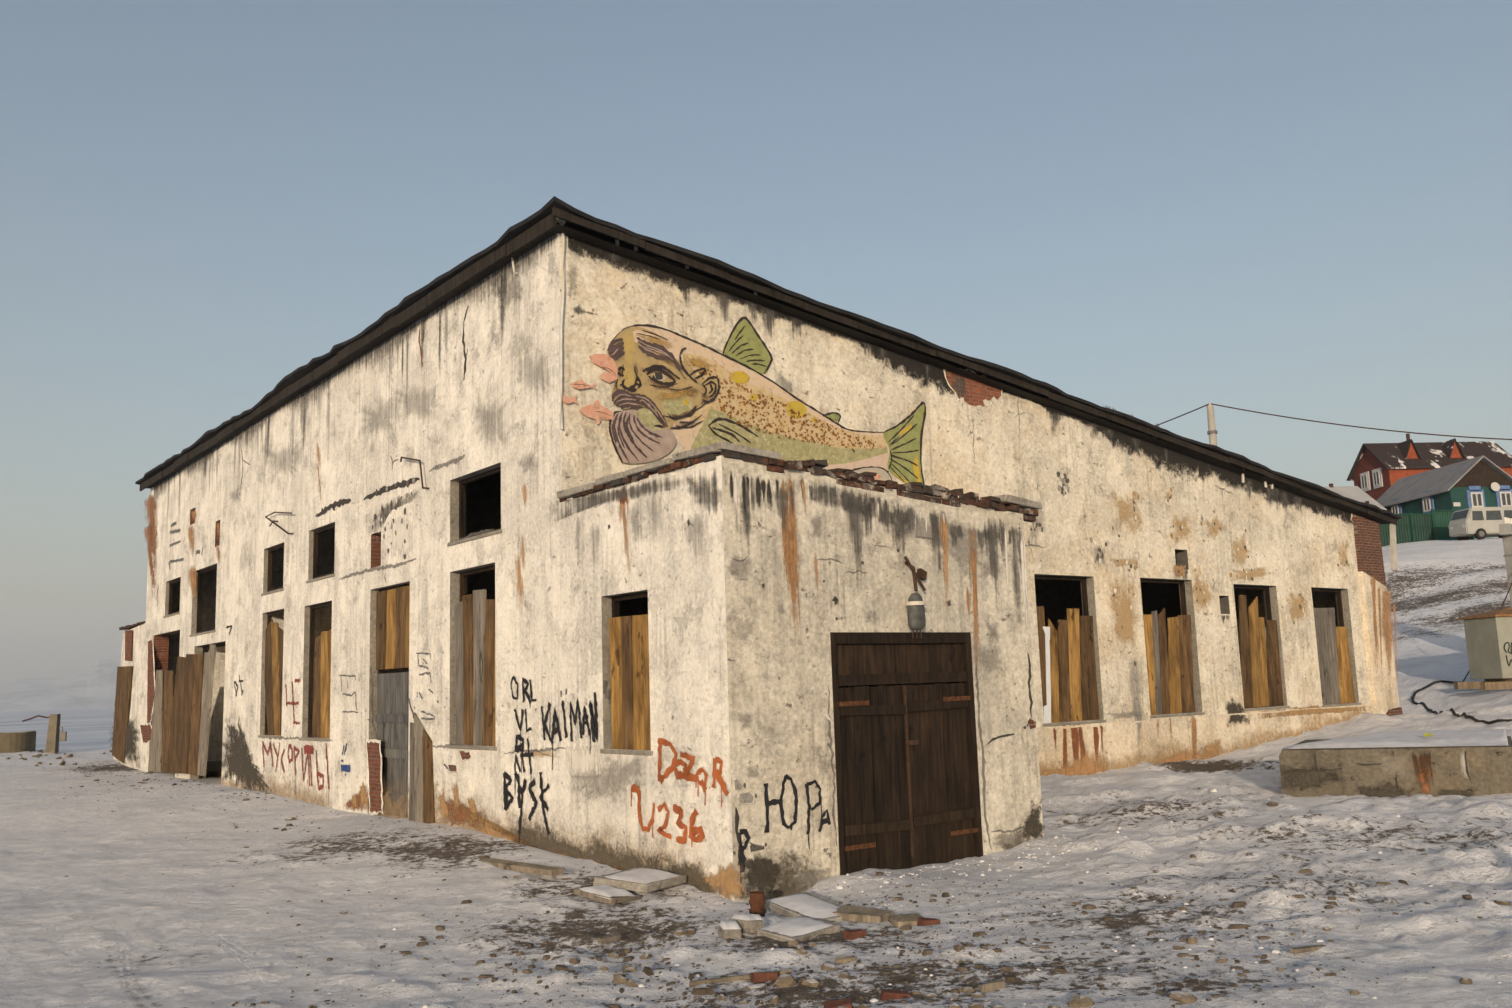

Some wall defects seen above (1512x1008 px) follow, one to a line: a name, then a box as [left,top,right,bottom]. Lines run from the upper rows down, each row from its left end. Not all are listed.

water stain [421,310,441,358]
water stain [500,268,516,329]
flaking render [943,368,1003,410]
corrosion [782,478,806,620]
water stain [561,472,1028,618]
corrosion [940,521,948,588]
corrosion [967,529,978,650]
flaking render [1090,491,1143,642]
corrosion [1371,576,1398,676]
corrosion [1053,725,1108,776]